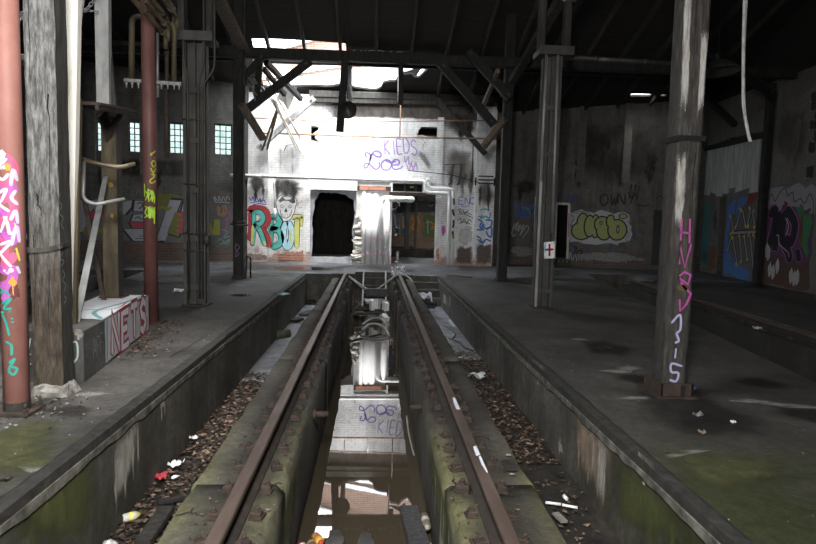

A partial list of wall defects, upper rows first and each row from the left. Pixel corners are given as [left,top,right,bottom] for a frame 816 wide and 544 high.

water stain [114,427,139,504]
water stain [592,442,606,500]